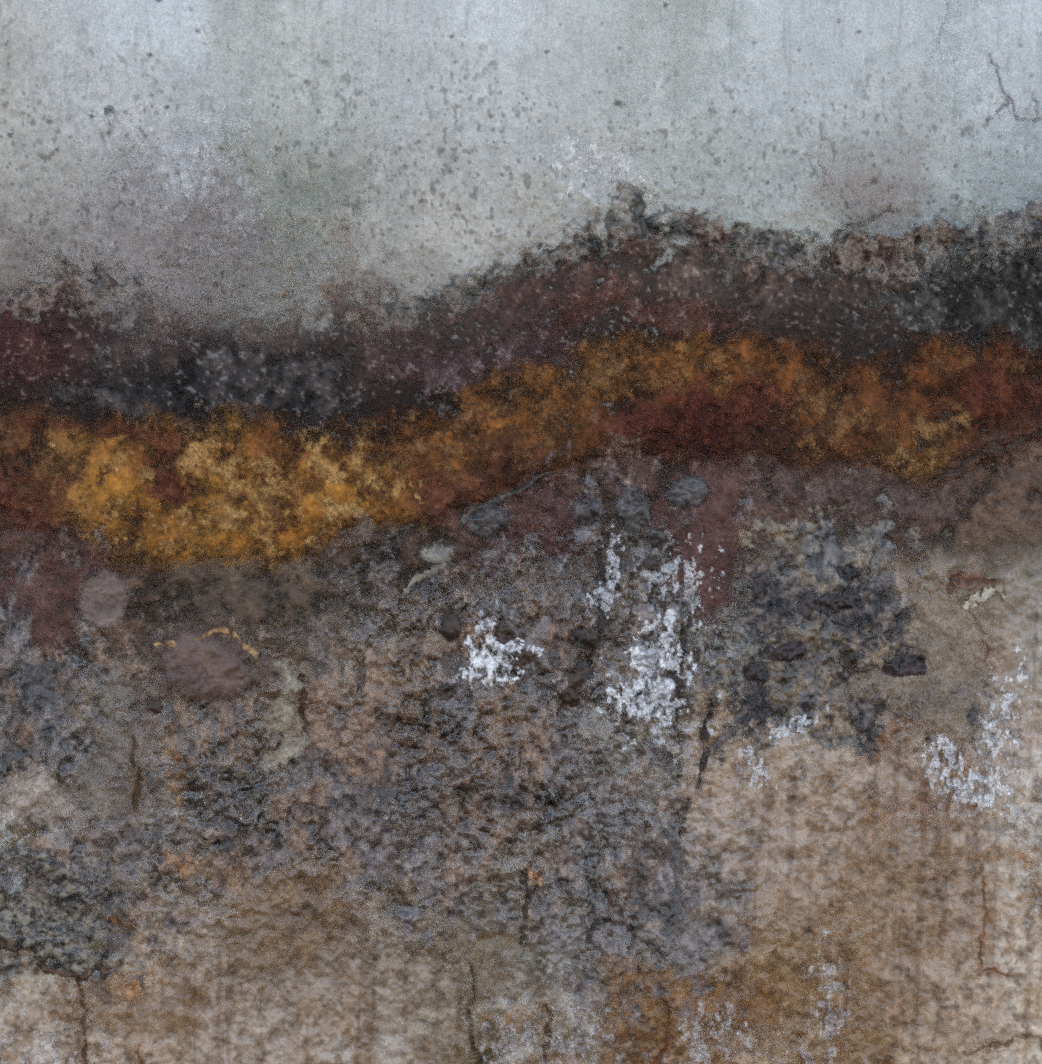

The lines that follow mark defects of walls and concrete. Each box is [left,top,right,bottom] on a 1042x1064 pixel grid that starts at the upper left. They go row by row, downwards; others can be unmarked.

crack [988,53,1042,122]
rust [0,331,1042,566]
damp [0,228,1042,1019]
peeling [0,841,124,983]
crack [78,984,88,1064]
crack [467,974,500,1064]
crack [542,1005,553,1062]